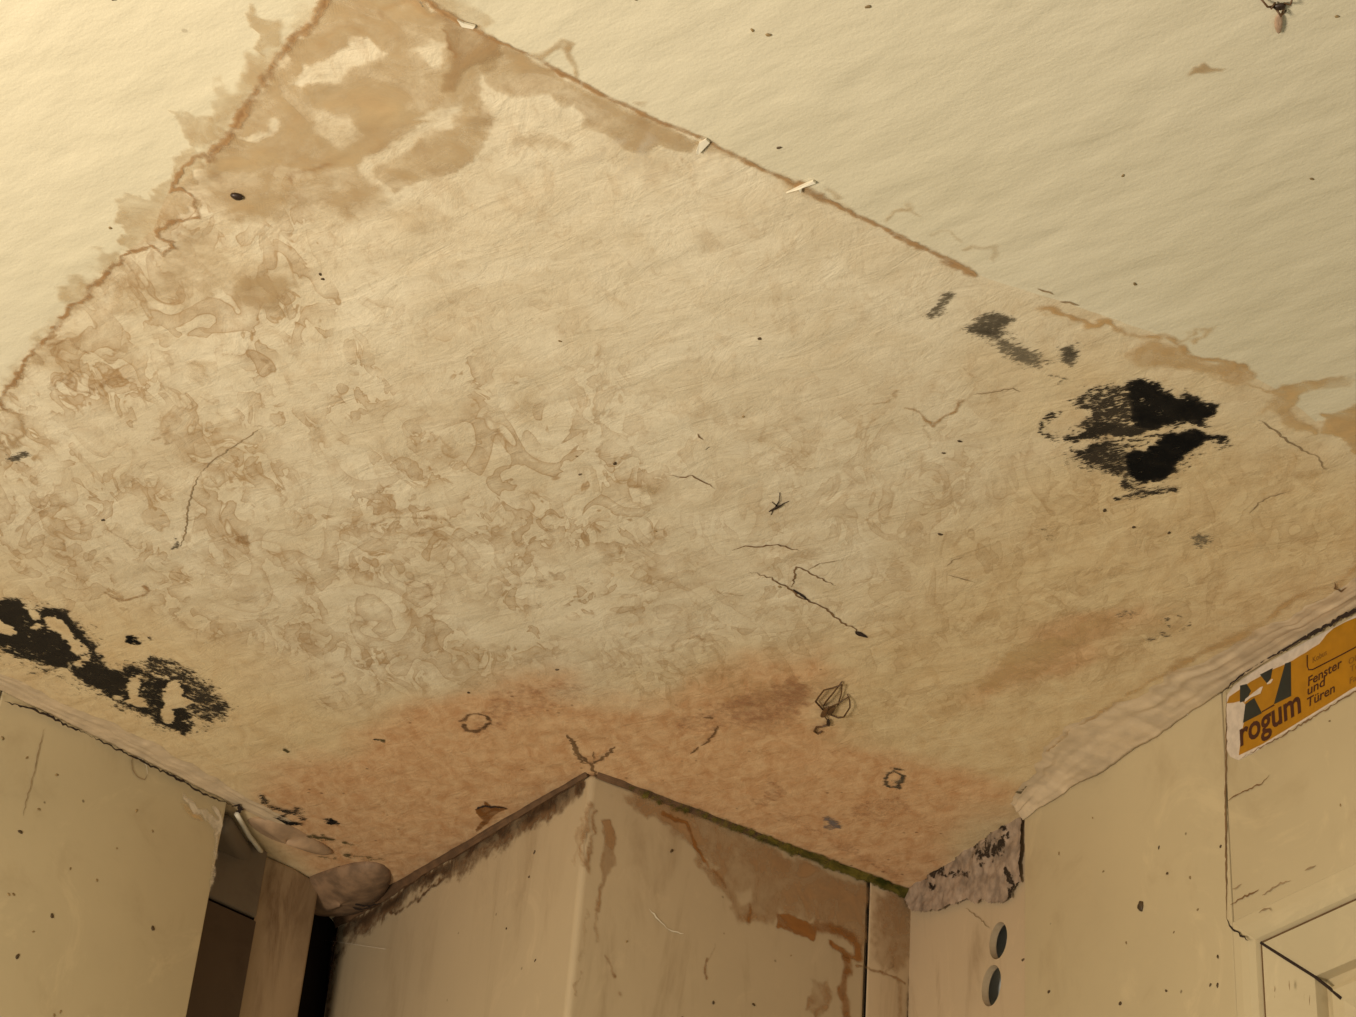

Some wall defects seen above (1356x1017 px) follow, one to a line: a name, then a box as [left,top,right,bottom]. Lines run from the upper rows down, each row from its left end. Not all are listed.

leakage [188,0,571,220]
leakage [926,291,955,319]
leakage [961,312,1079,385]
leakage [0,412,28,464]
leakage [1037,336,1252,501]
leakage [1272,379,1356,454]
crack [734,544,868,638]
leakage [0,597,234,736]
crack [5,701,244,816]
leakage [257,795,380,867]
rust [635,795,909,1017]
leakage [927,825,1015,898]